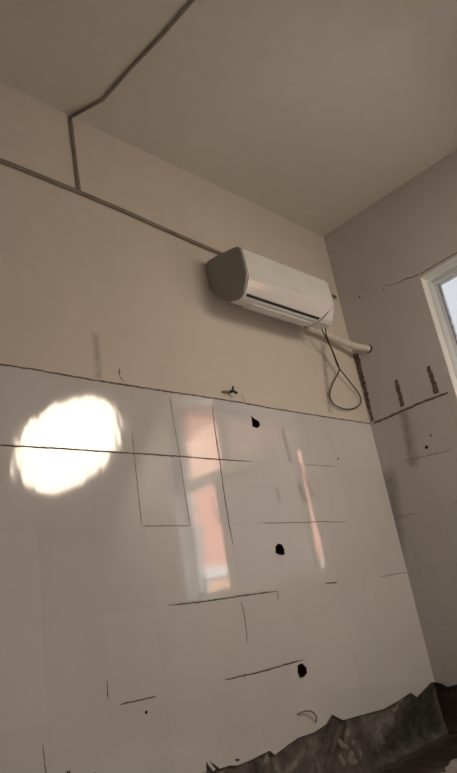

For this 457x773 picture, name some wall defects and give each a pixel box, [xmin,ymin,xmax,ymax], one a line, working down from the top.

spalling [204,682,457,773]